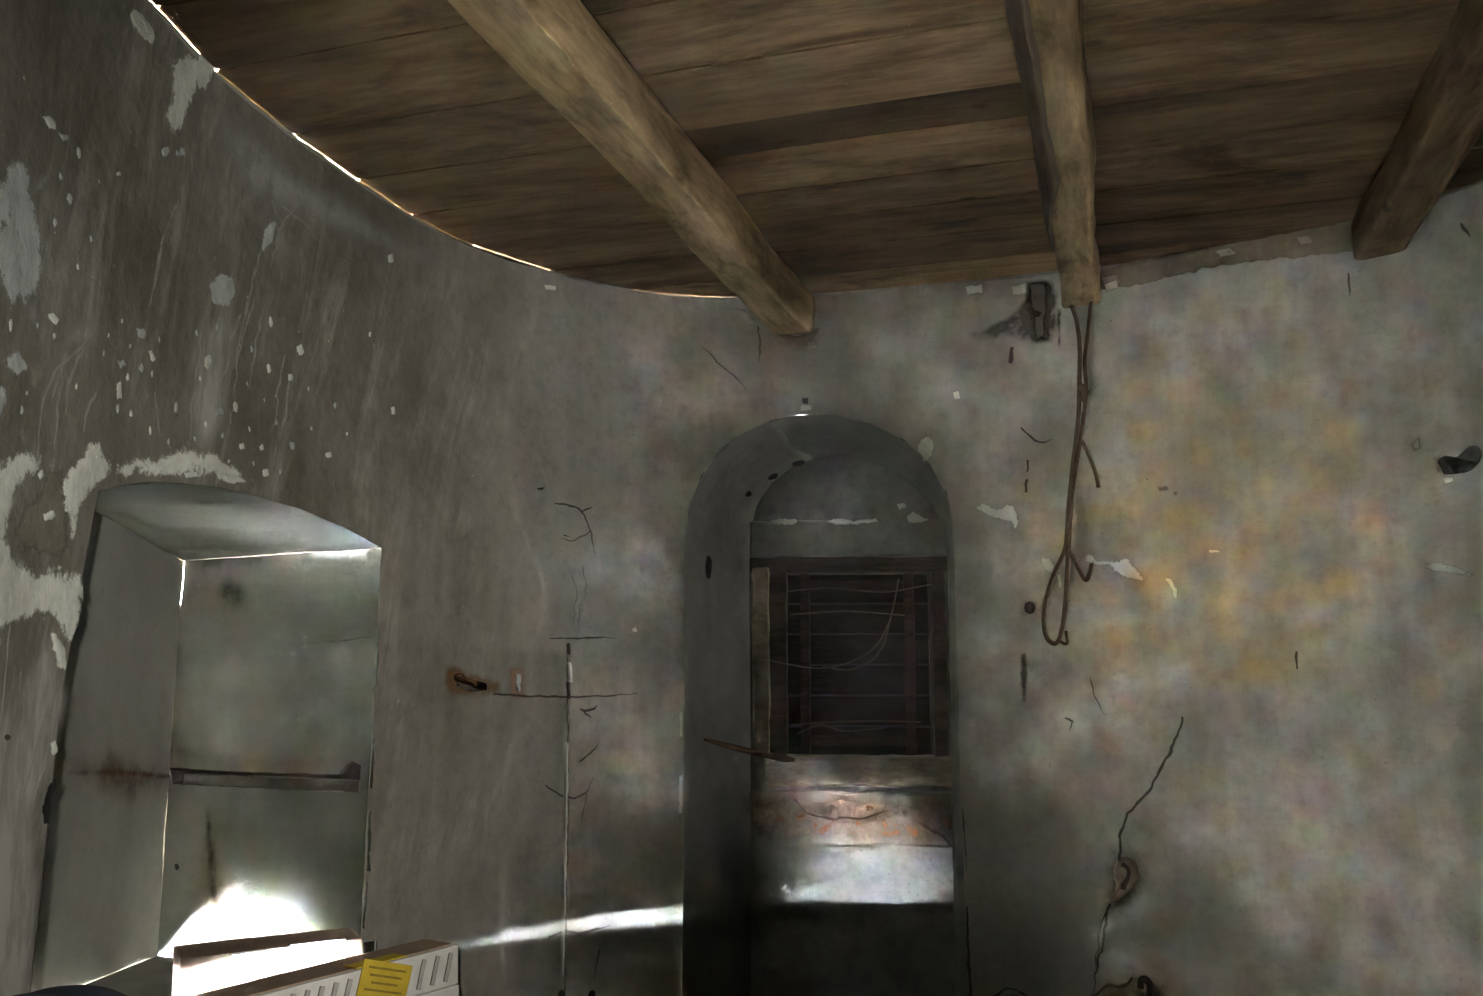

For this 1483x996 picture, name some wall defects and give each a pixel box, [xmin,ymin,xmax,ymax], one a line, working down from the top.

flaking render [161,54,214,157]
flaking render [0,160,73,339]
damp [1028,282,1061,343]
flaking render [0,350,28,415]
flaking render [43,274,282,540]
spalling [1438,446,1482,483]
flaking render [976,504,1018,529]
flaking render [1084,554,1143,581]
flaking render [0,452,83,996]
crack [1118,717,1183,861]
corrosion [208,823,226,924]
crack [1092,903,1111,995]